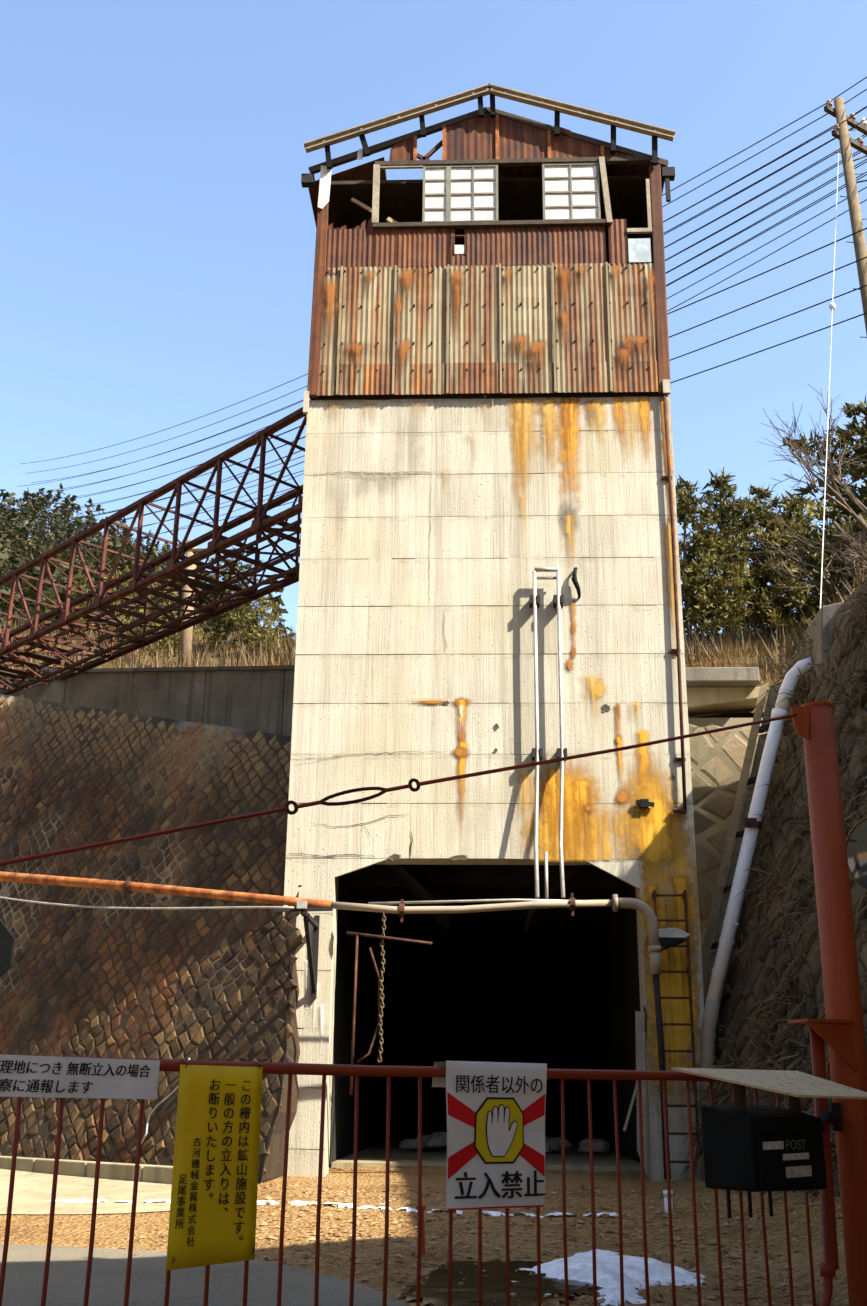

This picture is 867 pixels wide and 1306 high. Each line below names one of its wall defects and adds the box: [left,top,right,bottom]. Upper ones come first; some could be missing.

corrosion [450,270,463,332]
corrosion [511,335,547,368]
corrosion [558,265,586,343]
corrosion [617,269,655,368]
corrosion [513,397,676,622]
corrosion [566,601,576,670]
corrosion [419,698,470,801]
corrosion [615,704,623,777]